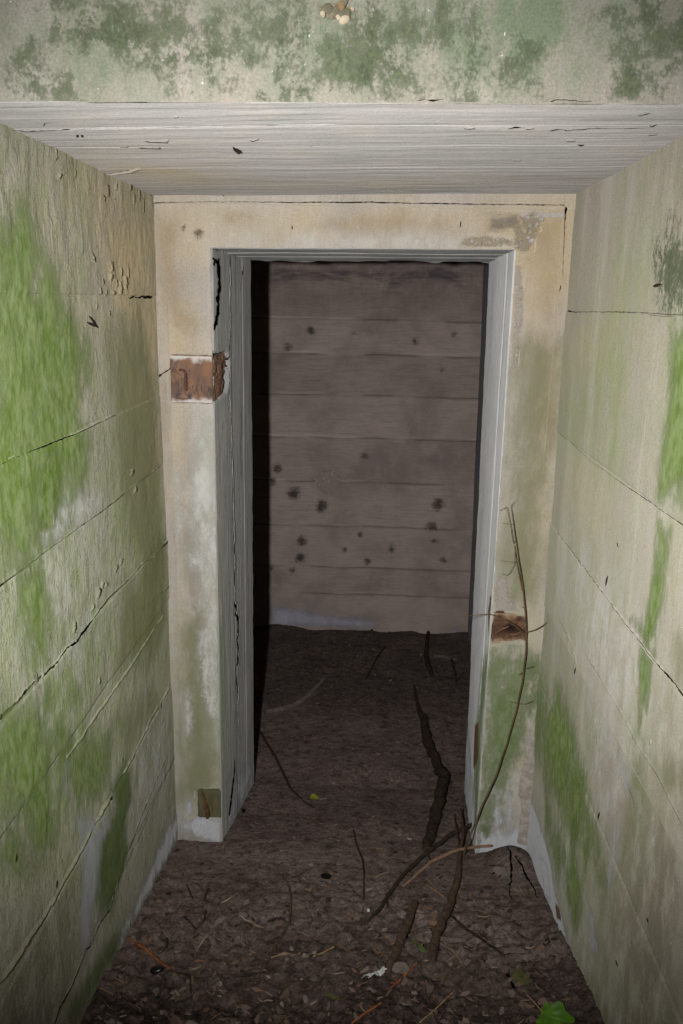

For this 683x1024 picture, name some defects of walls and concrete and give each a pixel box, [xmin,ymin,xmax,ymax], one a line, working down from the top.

damp [5,44,76,101]
damp [153,56,231,94]
damp [362,66,422,100]
damp [614,69,664,100]
spalling [463,212,545,250]
damp [37,451,100,545]
crack [212,257,243,730]
damp [17,570,50,672]
damp [638,521,668,723]
damp [57,731,130,813]
damp [79,818,109,947]
damp [464,736,598,951]